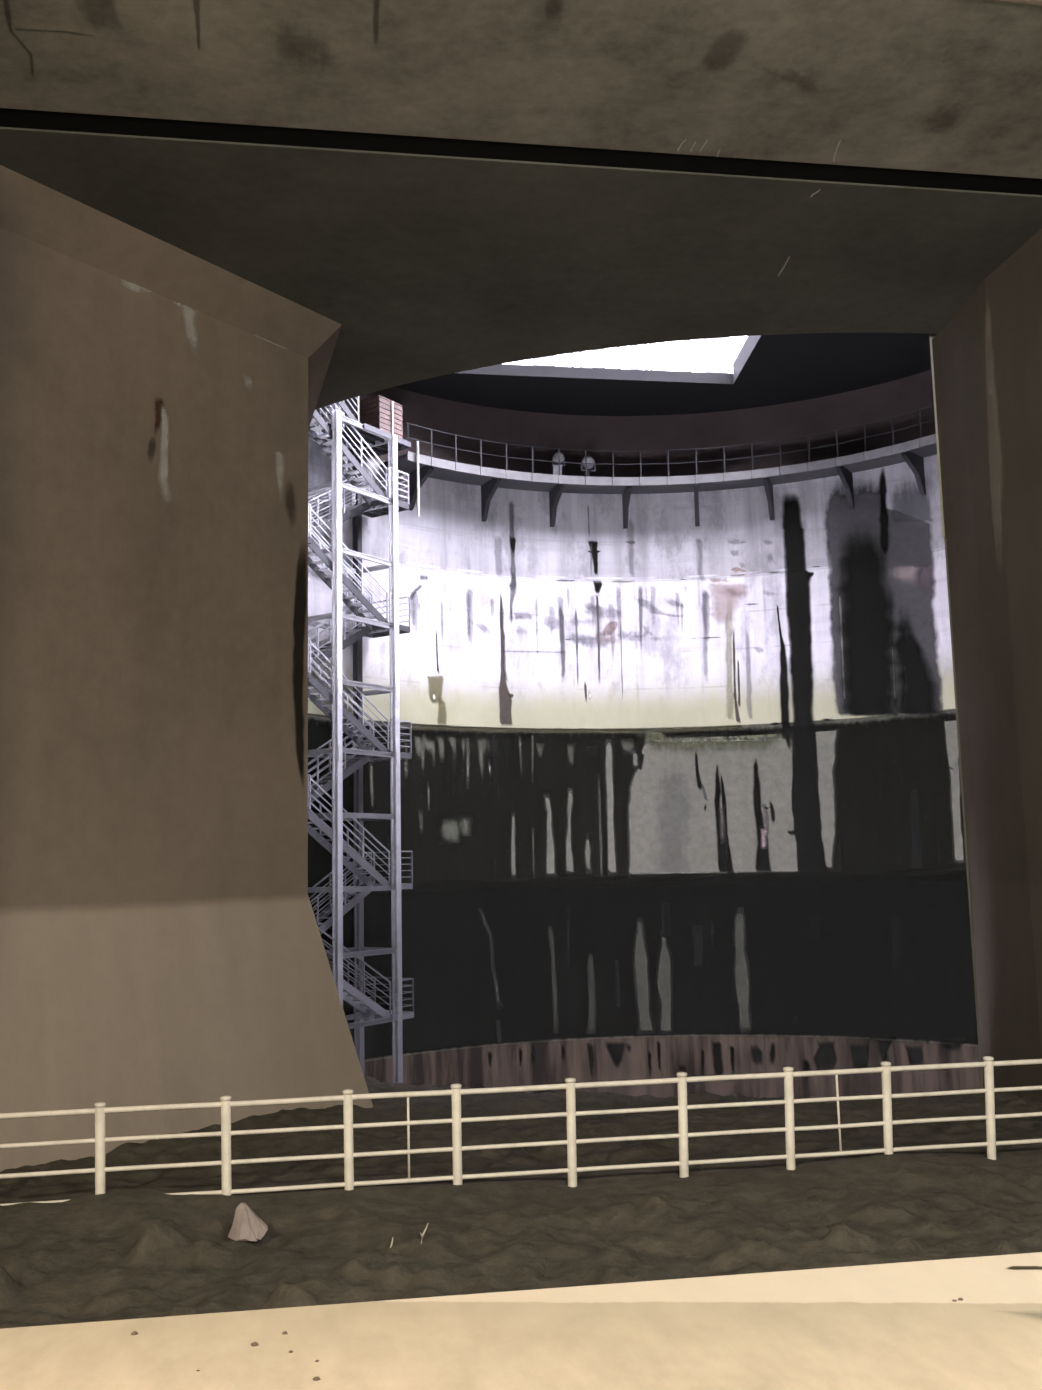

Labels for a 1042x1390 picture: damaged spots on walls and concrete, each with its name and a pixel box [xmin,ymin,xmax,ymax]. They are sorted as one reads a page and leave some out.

leakage [293,471,978,1076]